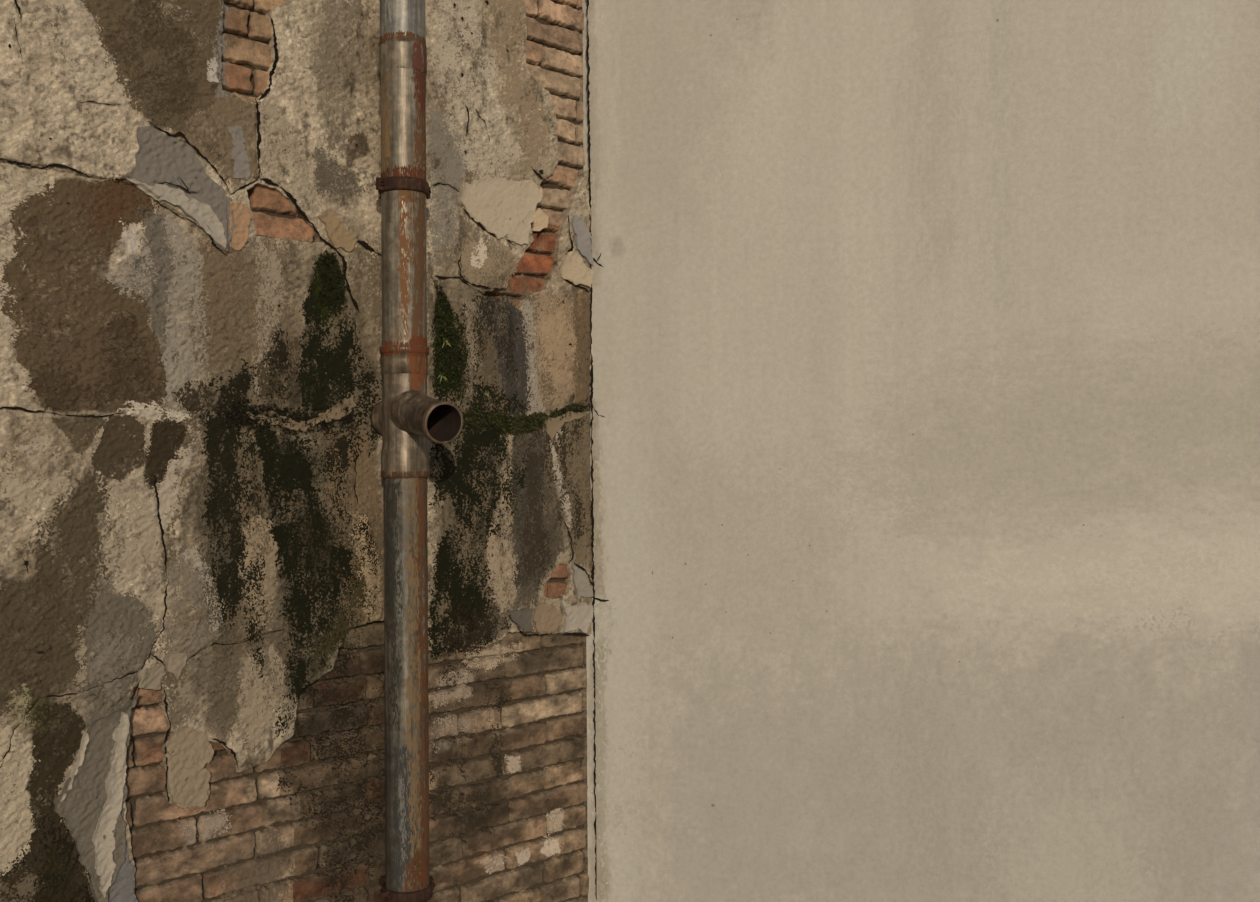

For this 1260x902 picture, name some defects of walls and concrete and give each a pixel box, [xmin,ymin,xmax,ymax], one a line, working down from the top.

crack [14,0,22,58]
crack [0,12,381,395]
peeling [125,126,319,250]
spalling [221,0,288,103]
corrosion [379,30,429,391]
spalling [460,0,594,308]
crack [0,406,124,418]
leakage [0,0,656,902]
crack [0,475,285,803]
spalling [53,620,385,902]
corrosion [380,470,430,902]
spalling [428,564,594,902]